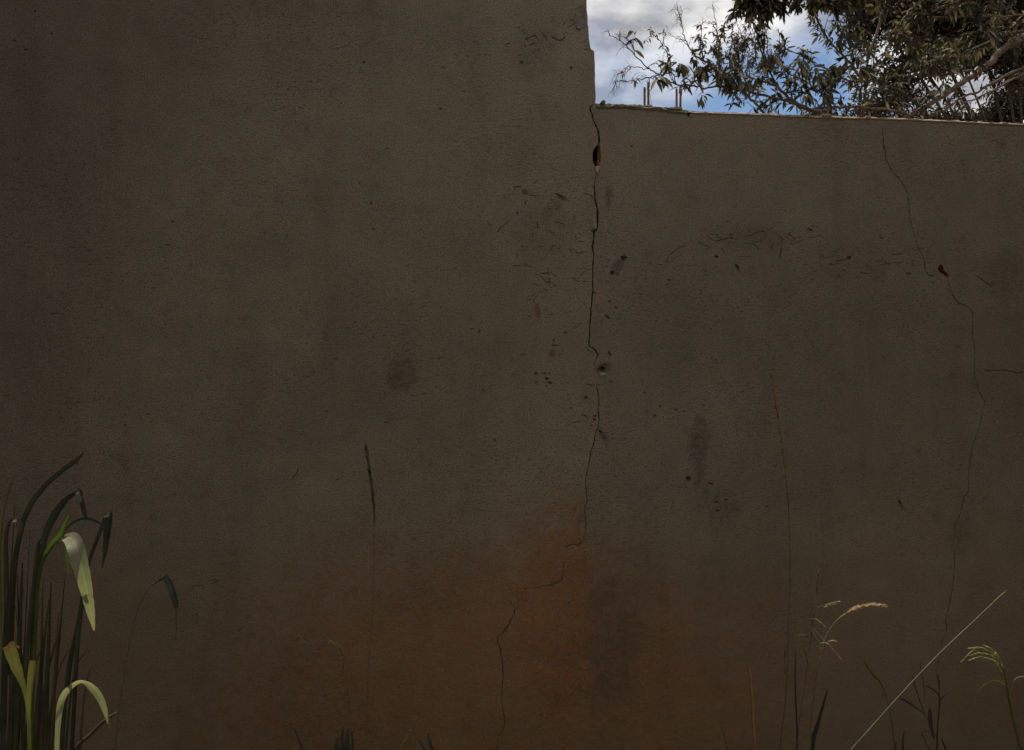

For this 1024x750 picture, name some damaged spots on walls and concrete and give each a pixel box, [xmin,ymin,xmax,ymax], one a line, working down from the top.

crack [496,176,600,749]
crack [589,105,600,147]
spalling [592,145,601,174]
crack [659,124,1024,672]